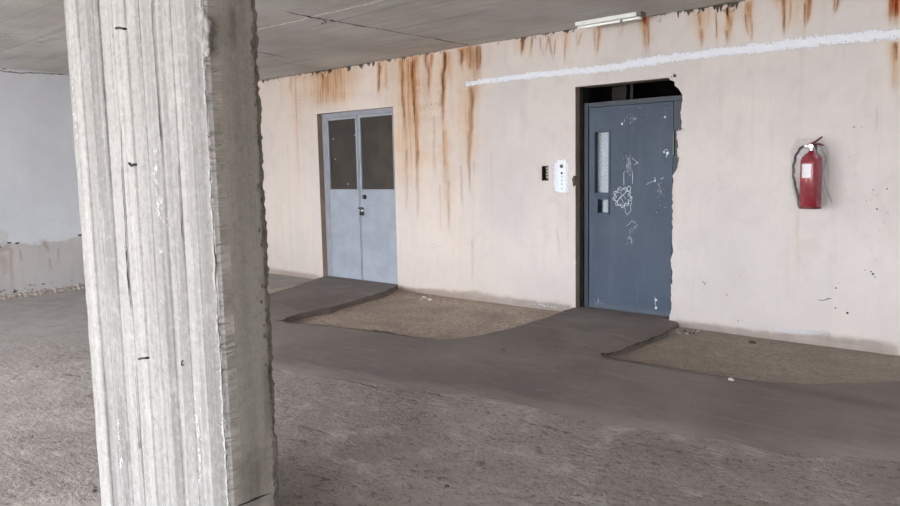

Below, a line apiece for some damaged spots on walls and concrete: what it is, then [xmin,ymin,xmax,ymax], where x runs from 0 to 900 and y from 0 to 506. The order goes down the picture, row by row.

spalling [663,73,684,231]